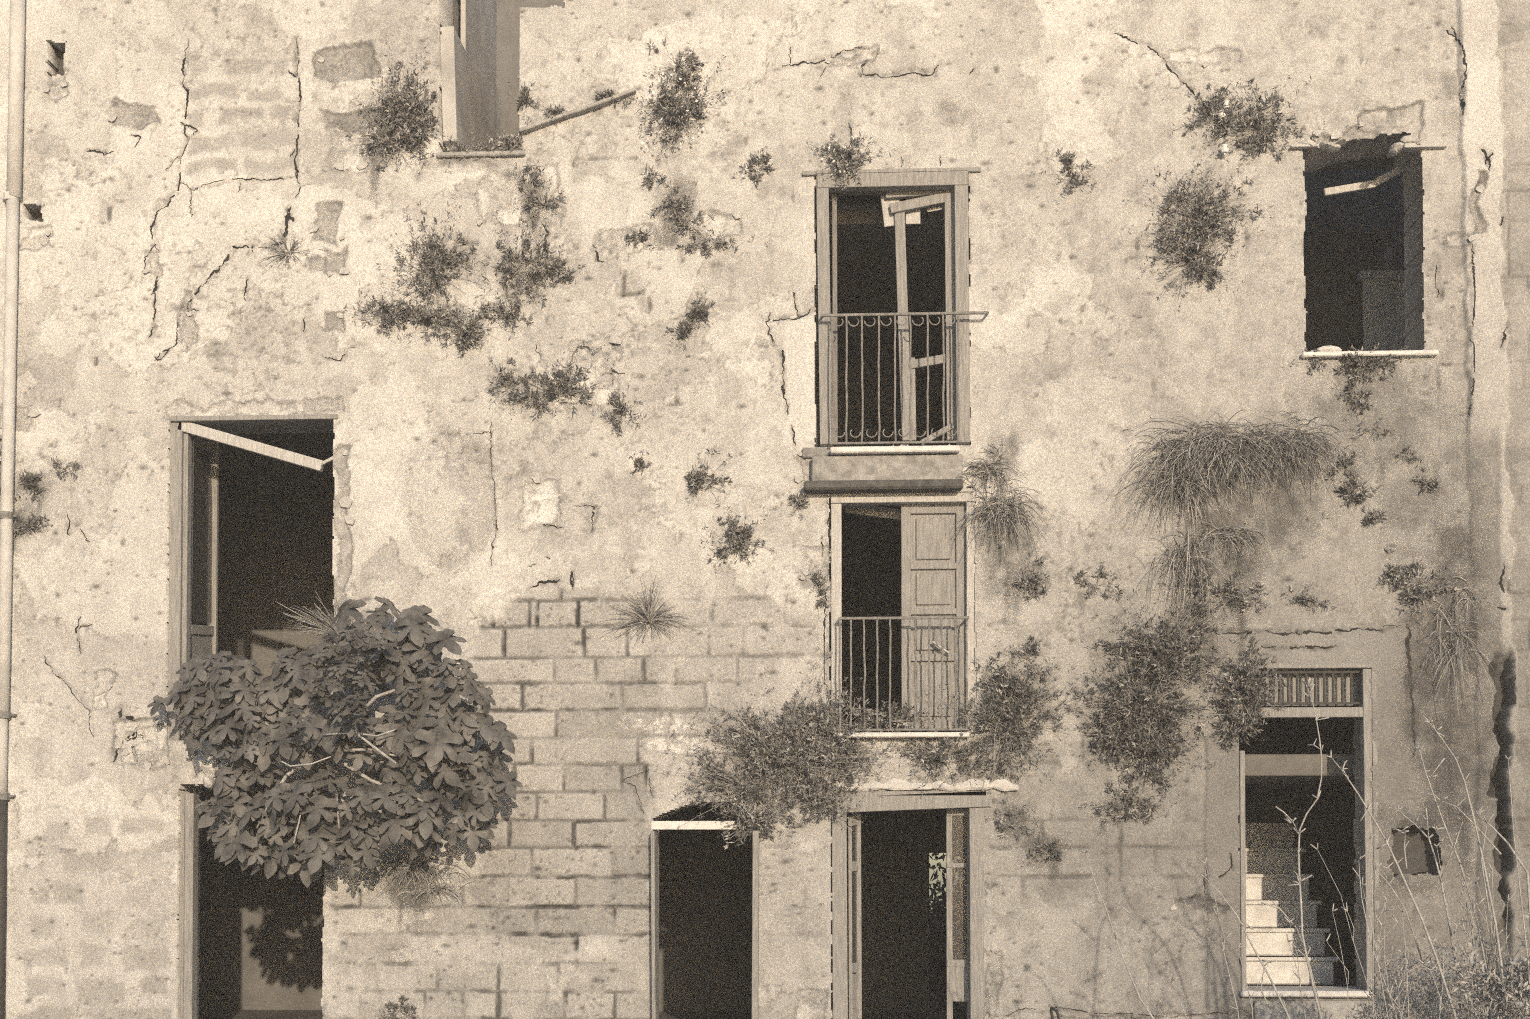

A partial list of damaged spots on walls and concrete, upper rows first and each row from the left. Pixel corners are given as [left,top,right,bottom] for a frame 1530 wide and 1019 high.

spalling [313,42,377,78]
crack [782,46,974,78]
crack [1114,33,1195,95]
spalling [108,101,159,129]
crack [88,135,141,155]
crack [143,39,302,361]
peeling [618,716,704,754]
peeling [379,909,433,924]
spalling [796,989,824,1019]